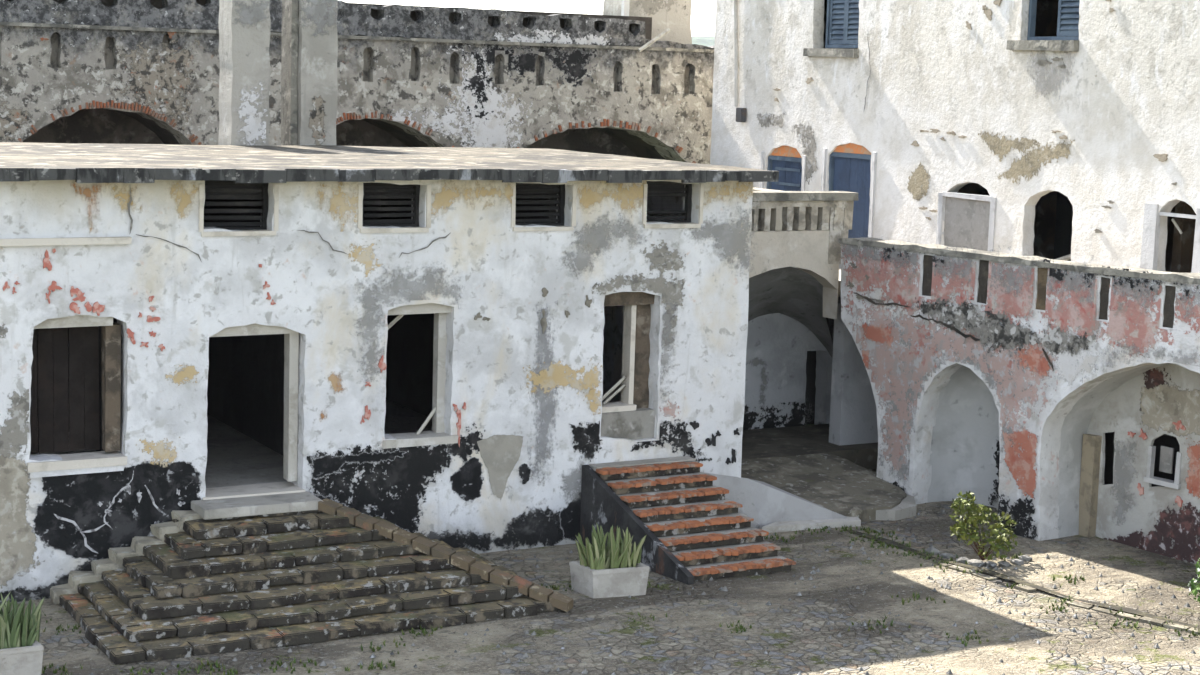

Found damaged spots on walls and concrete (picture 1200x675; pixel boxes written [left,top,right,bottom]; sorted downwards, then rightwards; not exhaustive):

spalling [908,162,937,220]
spalling [910,129,1075,185]
peeling [43,248,105,316]
peeling [127,295,165,351]
peeling [841,244,1200,378]
peeling [0,389,41,588]
crack [54,470,165,553]
damp [421,506,564,553]
damp [561,456,586,500]
peeling [1002,427,1039,499]
peeling [1128,367,1200,507]